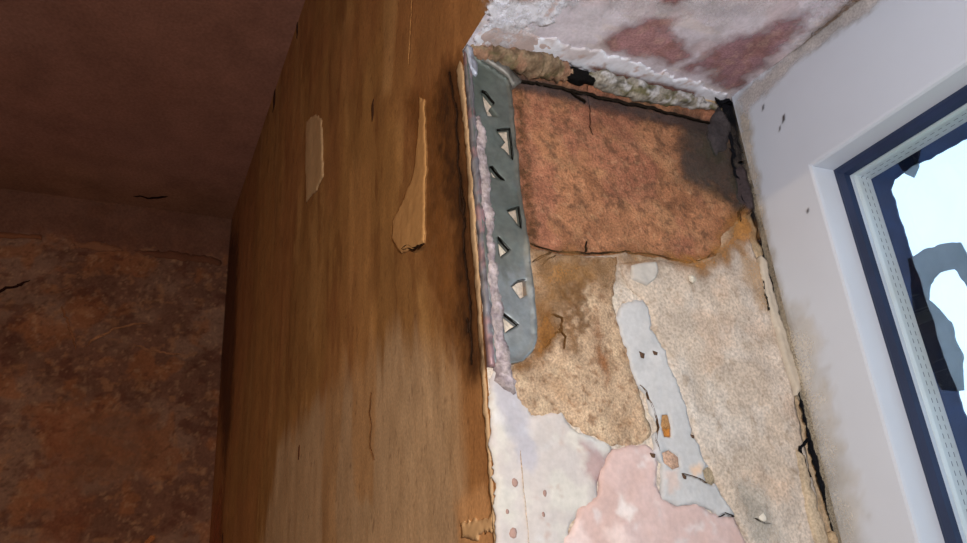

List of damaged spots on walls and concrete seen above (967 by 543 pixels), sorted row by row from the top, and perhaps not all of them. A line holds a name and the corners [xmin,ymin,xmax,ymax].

peeling [606,14,805,90]
peeling [305,115,324,203]
peeling [392,96,428,254]
flaking render [471,44,745,286]
damp [515,74,749,213]
crack [0,280,30,293]
flaking render [757,255,802,396]